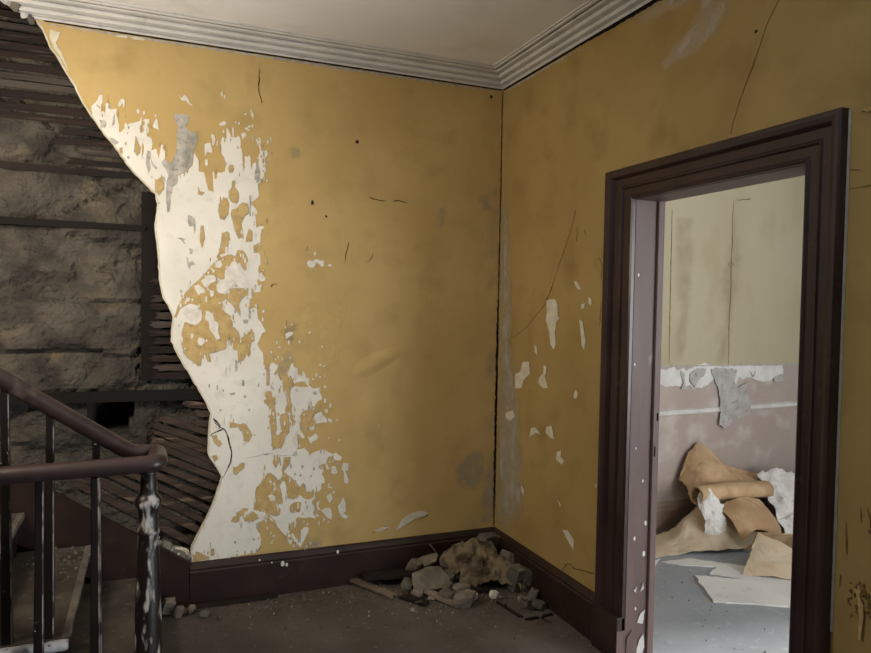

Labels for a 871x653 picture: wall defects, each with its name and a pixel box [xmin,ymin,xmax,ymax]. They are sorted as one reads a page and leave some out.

crack [730,0,779,134]
peeling [0,0,349,563]
crack [44,0,662,525]
peeling [546,299,560,350]
peeling [579,297,592,349]
crack [666,229,674,359]
crack [728,199,750,365]
peeling [515,345,548,389]
peeling [529,426,554,440]
peeling [616,607,645,653]
flaking render [847,581,871,640]